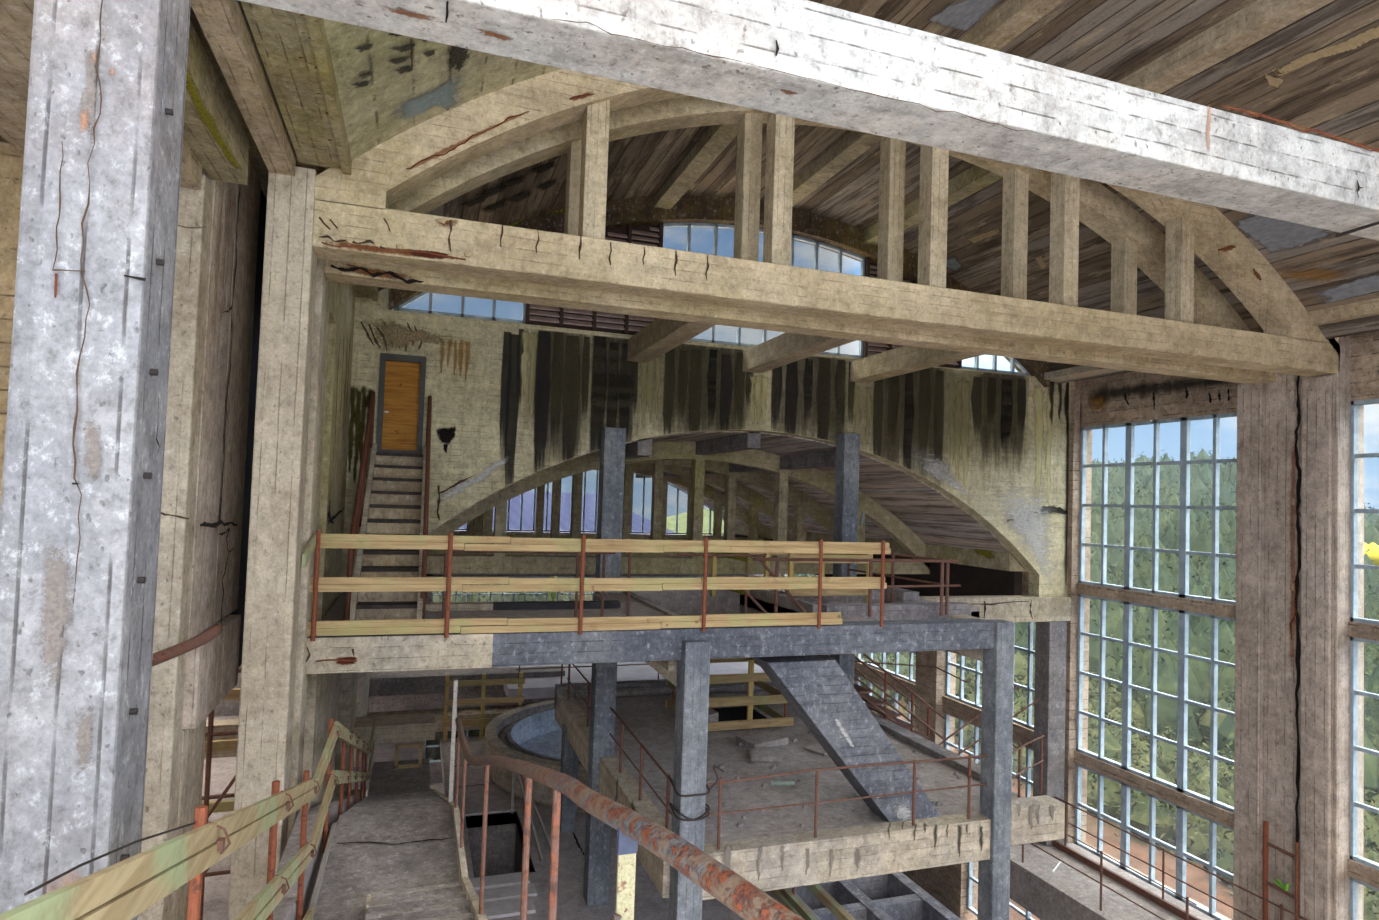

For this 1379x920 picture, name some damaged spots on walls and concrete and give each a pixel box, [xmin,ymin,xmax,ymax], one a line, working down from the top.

peeling [1264,26,1379,88]
crack [52,0,103,604]
crack [124,274,146,282]
spalling [320,235,472,284]
crack [446,220,454,252]
crack [579,235,709,279]
leakage [441,340,470,379]
crack [161,191,240,627]
leakage [500,329,1104,582]
crack [1289,375,1302,883]